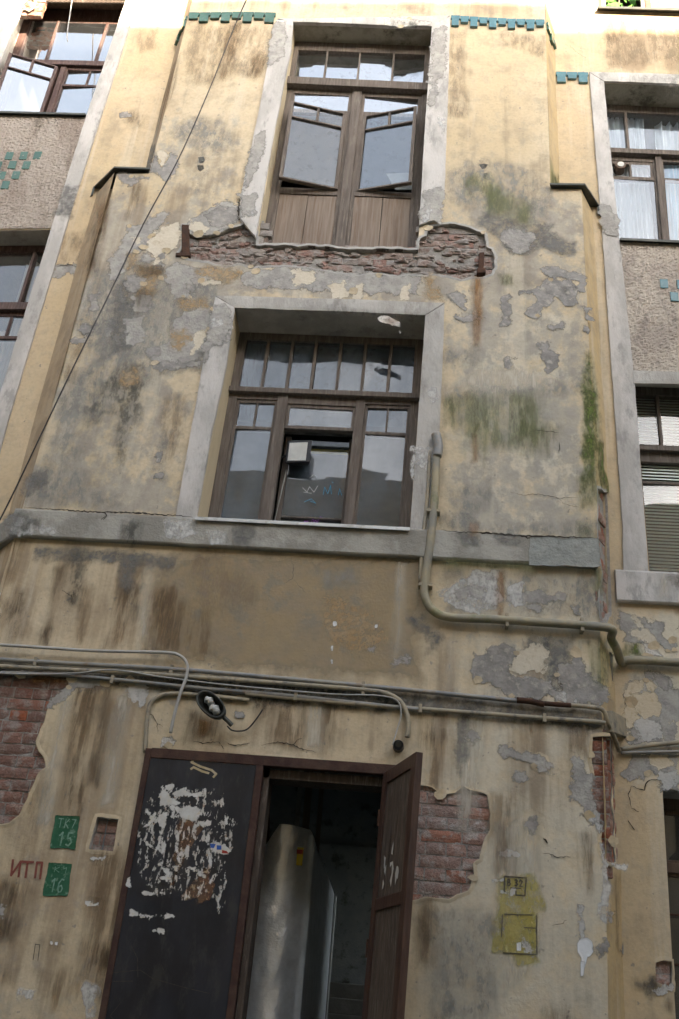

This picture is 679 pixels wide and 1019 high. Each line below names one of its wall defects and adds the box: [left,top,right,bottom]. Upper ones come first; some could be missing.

peeling [384,16,448,106]
flaking render [85,130,498,372]
peeling [499,266,595,334]
water stain [4,514,56,538]
water stain [35,523,176,602]
water stain [164,520,194,541]
water stain [206,524,255,545]
flaking render [595,485,678,657]
peeling [470,642,610,706]
flaking render [0,670,154,828]
peeling [568,670,679,879]
flaking render [412,782,494,904]